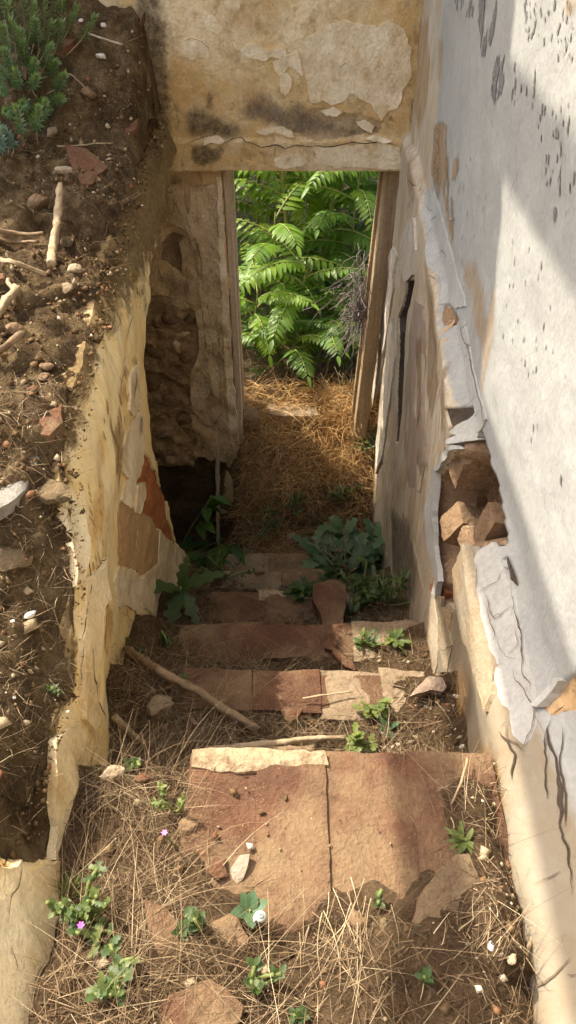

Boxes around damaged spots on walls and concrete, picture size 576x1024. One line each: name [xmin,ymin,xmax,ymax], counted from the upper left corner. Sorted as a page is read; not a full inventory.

damp [189,98,239,165]
peeling [203,135,225,146]
damp [247,98,332,131]
crack [182,136,397,166]
peeling [240,20,413,170]
flaking render [371,121,576,745]
flaking render [0,176,239,1024]
crack [476,569,572,894]